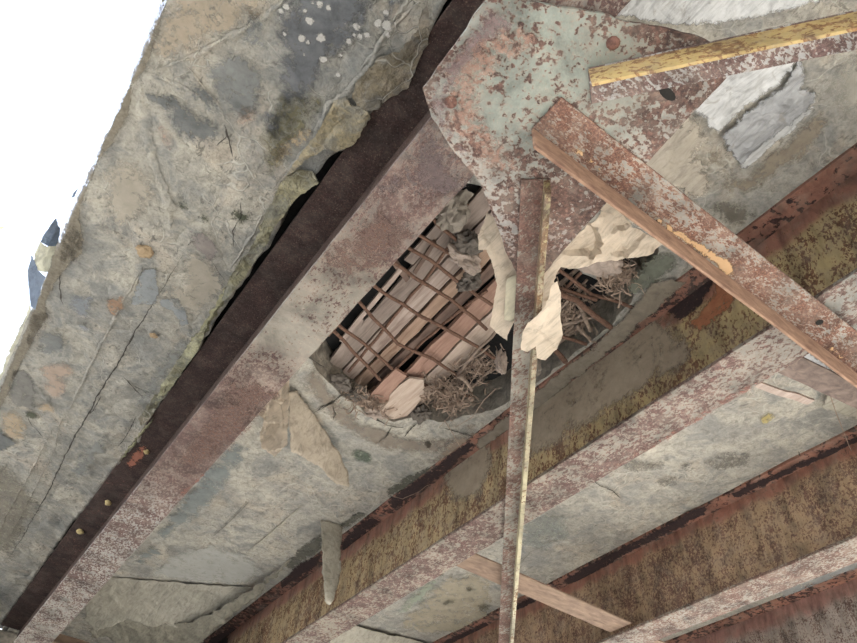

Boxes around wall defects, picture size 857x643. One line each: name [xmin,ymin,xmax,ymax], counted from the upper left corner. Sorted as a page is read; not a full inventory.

damp [145,0,399,171]
rust [446,27,537,172]
spalling [328,218,507,393]
spalling [558,268,634,330]
rust [668,279,734,330]
crack [12,243,226,553]
rust [127,446,147,469]
rust [388,442,473,511]
rust [732,437,857,497]
rust [279,555,321,588]
rust [342,518,378,550]
rust [564,505,708,584]